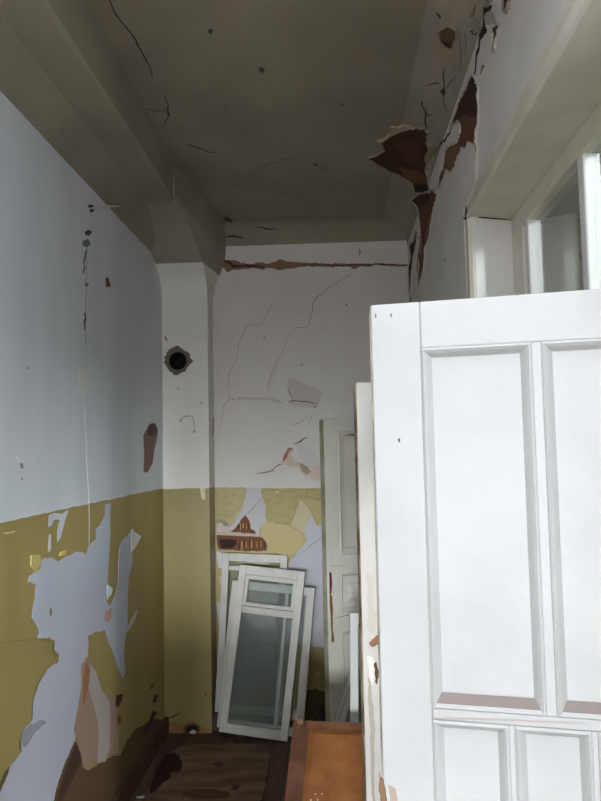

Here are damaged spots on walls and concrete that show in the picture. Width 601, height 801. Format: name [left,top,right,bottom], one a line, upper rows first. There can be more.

crack [109,0,153,79]
spalling [436,13,457,50]
crack [421,4,492,148]
spalling [471,0,511,54]
spalling [367,73,481,297]
peeling [287,378,324,408]
crack [223,249,408,444]
flaking render [143,423,158,473]
spalling [282,448,312,477]
peeling [216,487,267,585]
peeling [239,505,324,648]
peeling [0,503,162,801]